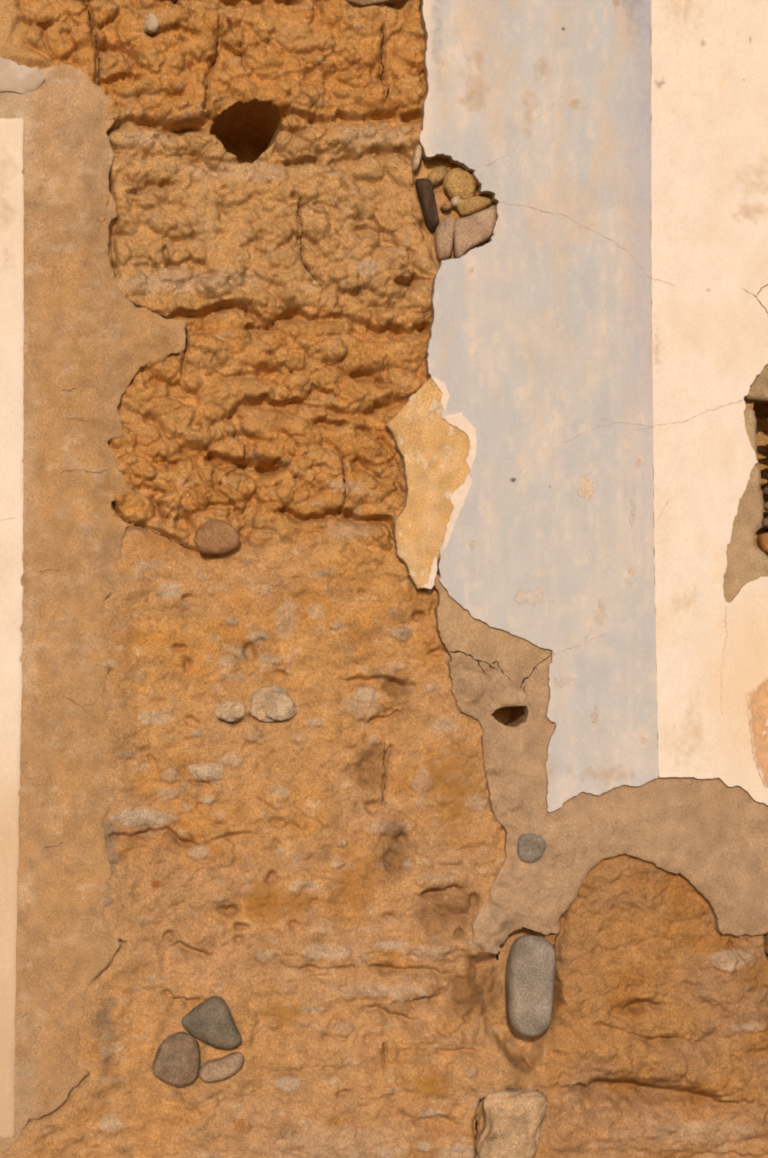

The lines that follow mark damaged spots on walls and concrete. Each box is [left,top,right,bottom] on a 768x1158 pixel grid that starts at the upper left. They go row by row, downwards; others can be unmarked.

crack [474,136,675,286]
spalling [0,0,505,967]
crack [543,400,741,452]
spalling [753,401,768,536]
flaking render [750,681,768,786]